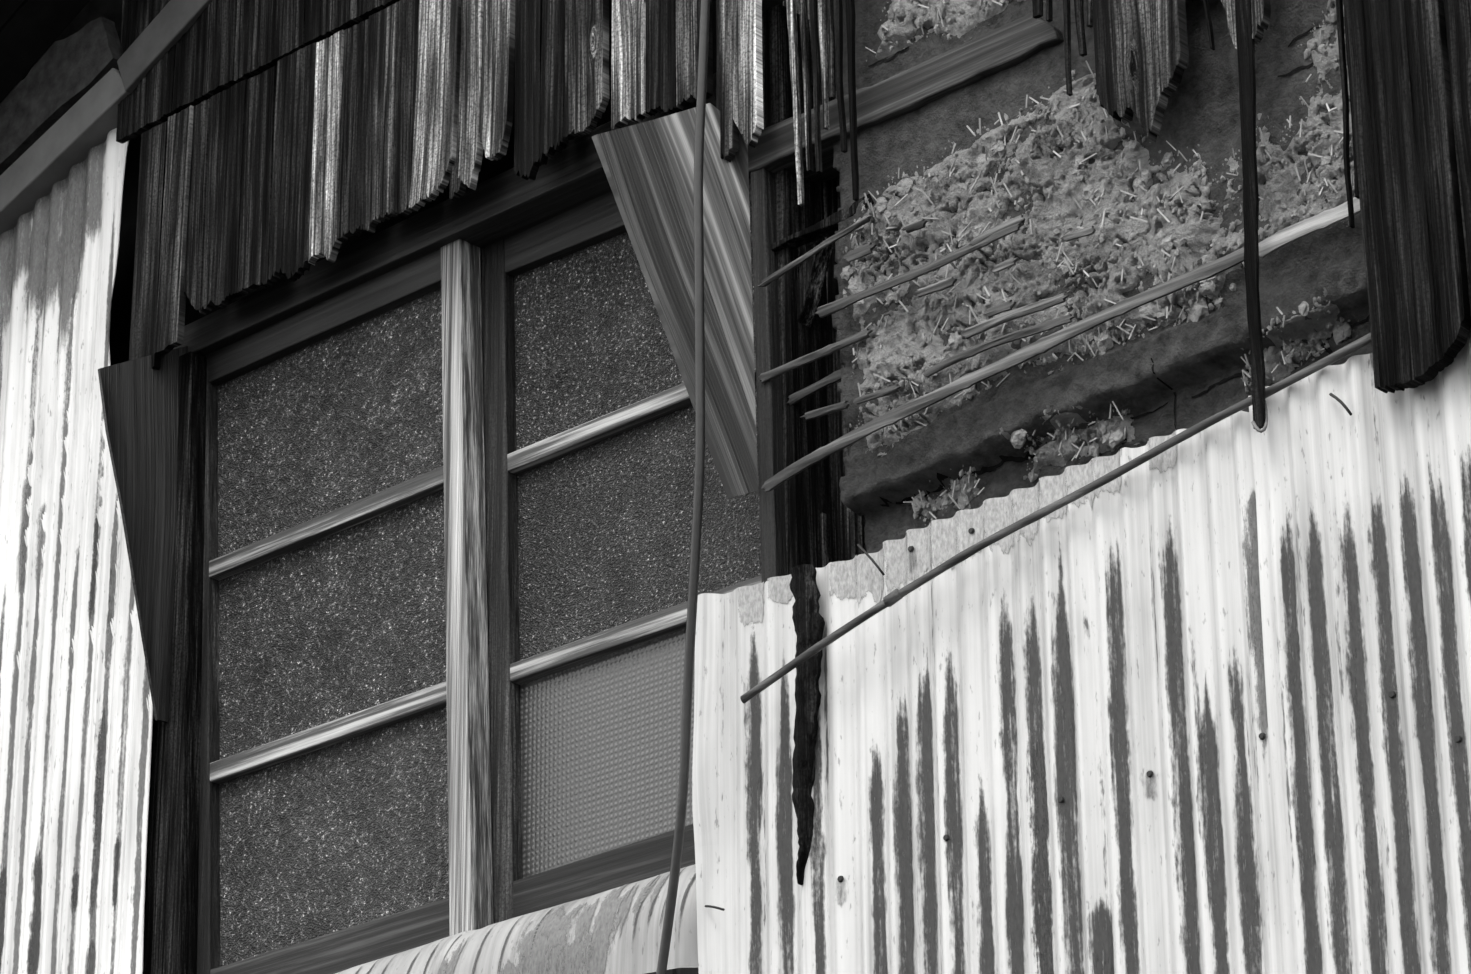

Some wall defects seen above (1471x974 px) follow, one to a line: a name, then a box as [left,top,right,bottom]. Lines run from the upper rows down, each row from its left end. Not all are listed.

spalling [840,0,1359,457]
peeling [738,574,793,627]
peeling [829,401,1177,606]
water stain [1243,490,1268,750]